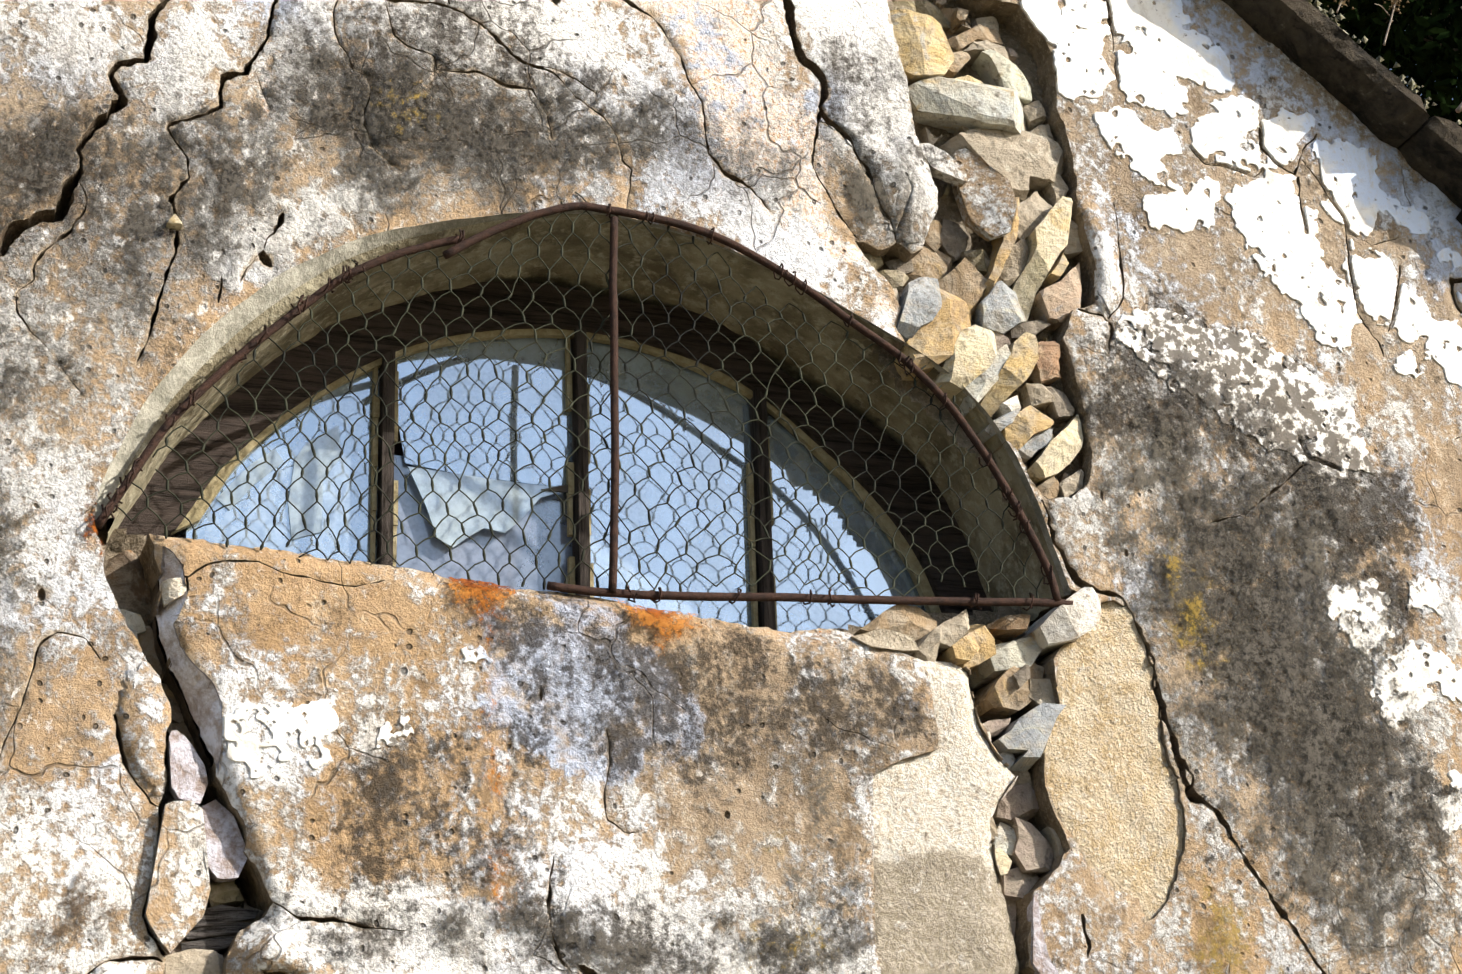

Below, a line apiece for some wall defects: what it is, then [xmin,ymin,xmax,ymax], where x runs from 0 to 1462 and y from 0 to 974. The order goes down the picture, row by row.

crack [0,0,170,394]
damp [0,12,732,315]
crack [783,0,900,256]
flaking render [855,0,1462,514]
flaking render [96,522,339,974]
rust [447,577,516,652]
rust [475,680,510,810]
rust [613,598,703,649]
crack [1032,499,1327,974]
damp [1066,323,1462,974]
peeling [1321,576,1462,728]
damp [437,892,719,974]